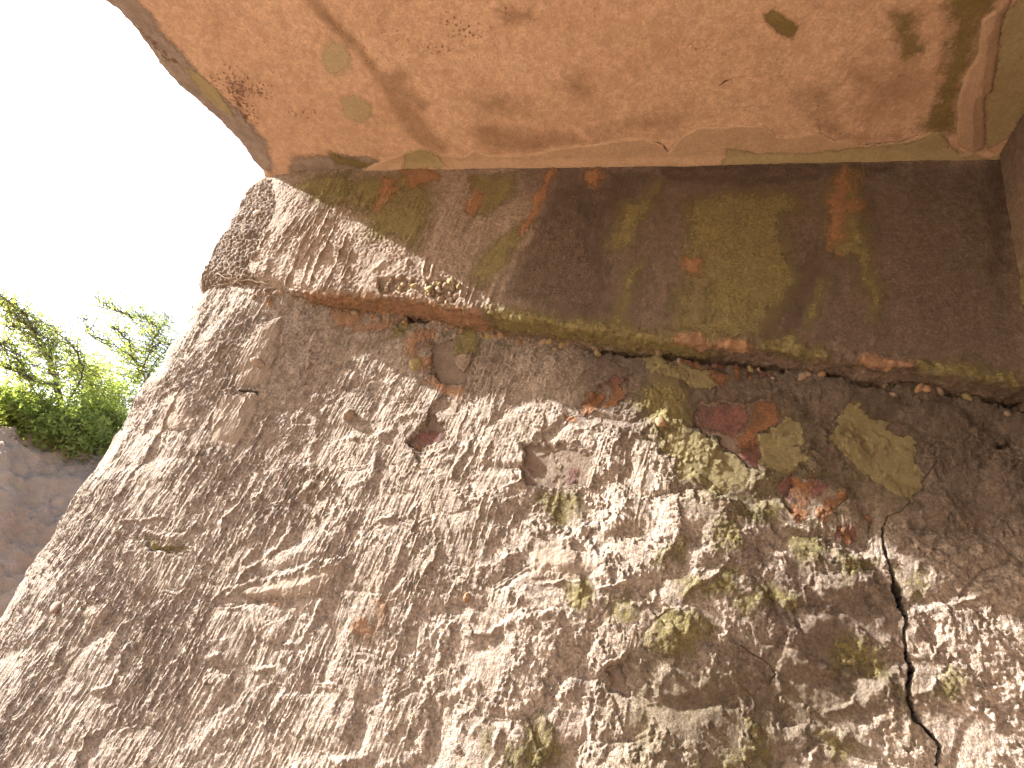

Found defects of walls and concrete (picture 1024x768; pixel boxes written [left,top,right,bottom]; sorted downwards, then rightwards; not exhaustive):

peeling [364,0,1012,171]
water stain [507,161,1011,377]
rust [826,164,865,256]
crack [881,422,940,765]